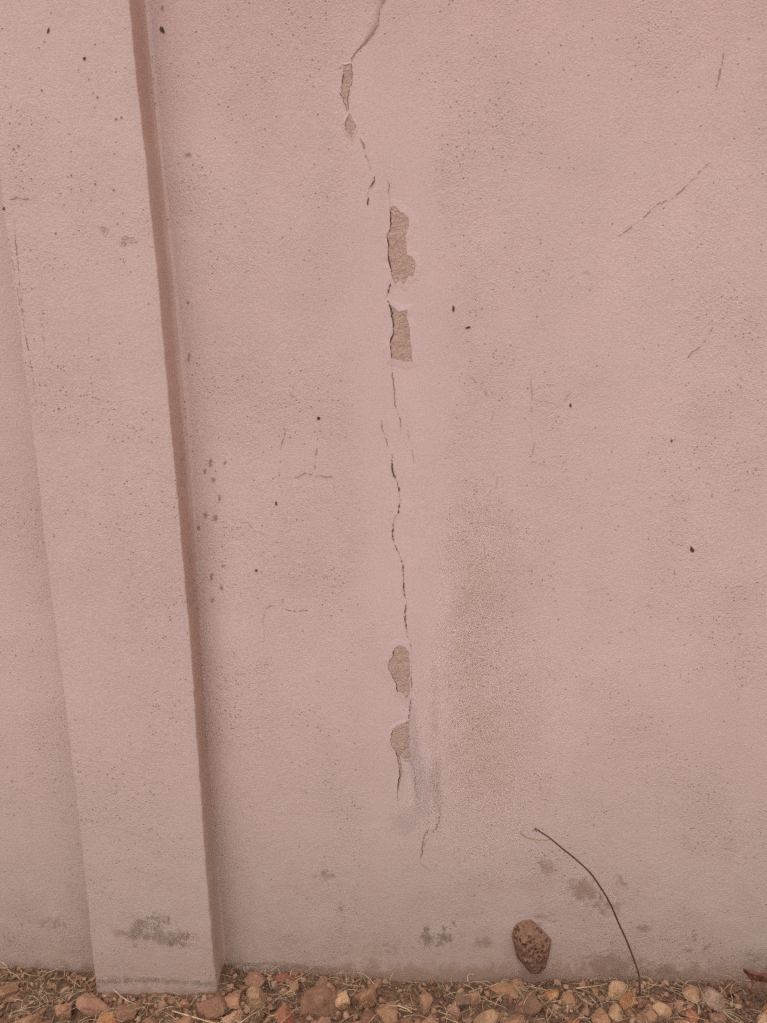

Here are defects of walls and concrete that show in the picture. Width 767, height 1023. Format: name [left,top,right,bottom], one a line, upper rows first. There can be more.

peeling [338,62,359,141]
crack [340,0,385,109]
peeling [379,198,424,370]
crack [381,372,411,647]
peeling [381,638,417,705]
peeling [387,716,414,802]